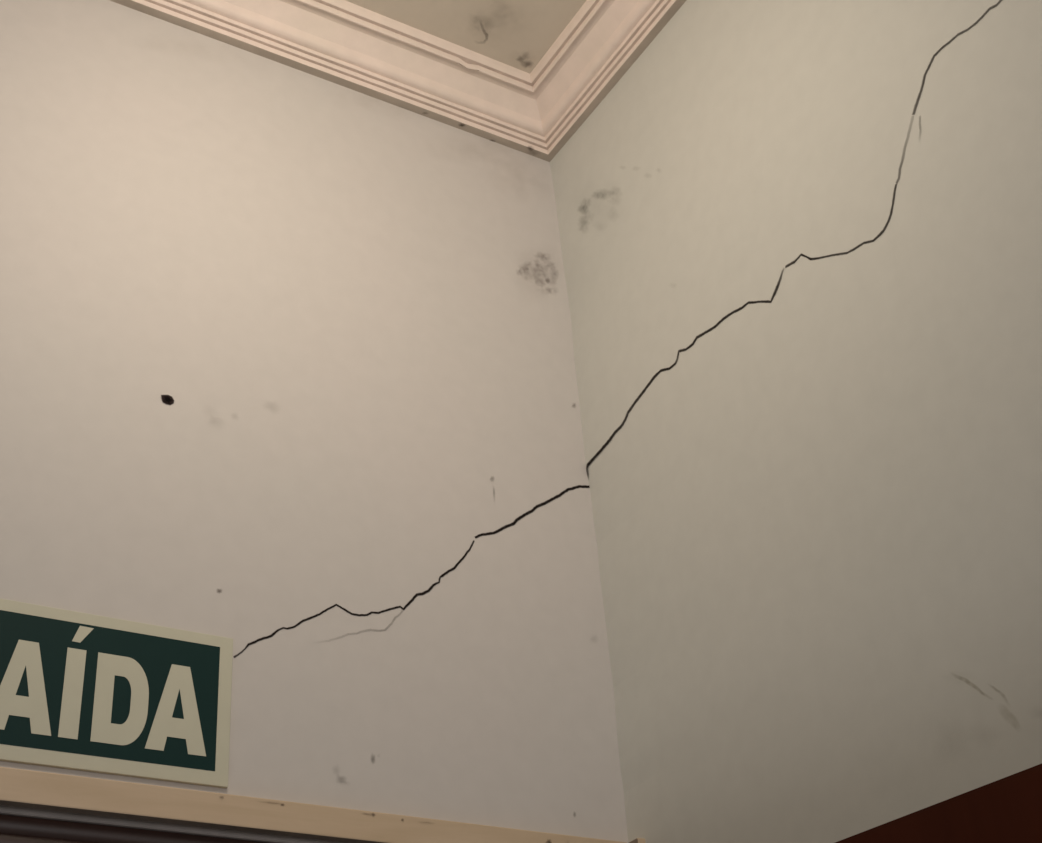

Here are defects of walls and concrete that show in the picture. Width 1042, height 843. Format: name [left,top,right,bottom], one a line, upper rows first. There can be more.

crack [912,0,1002,115]
crack [233,184,897,658]